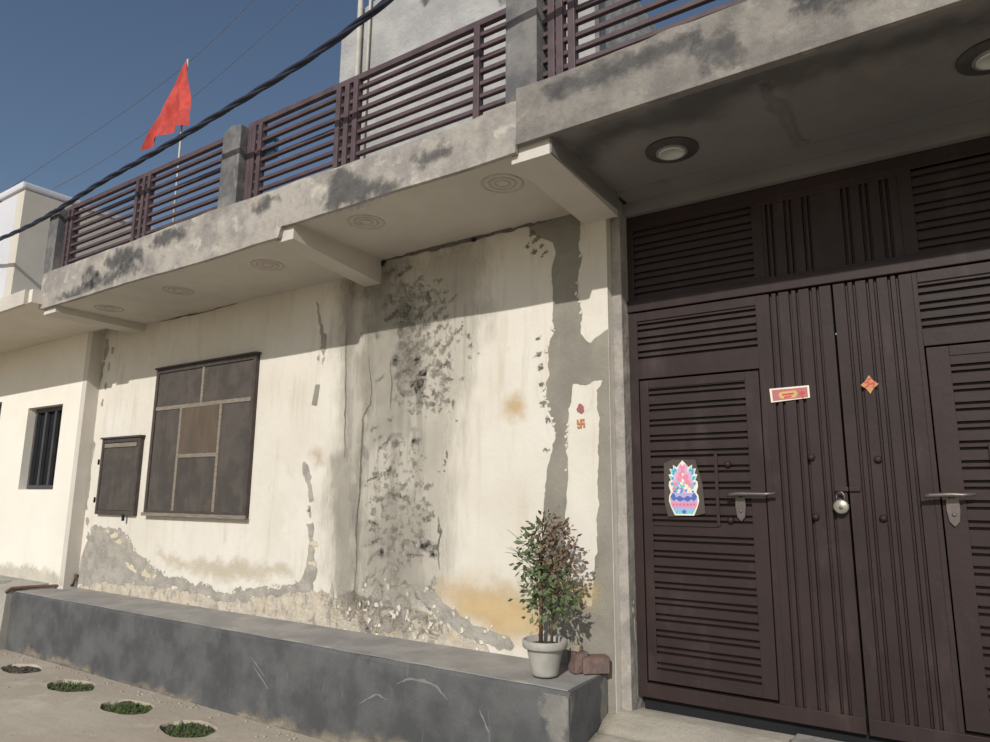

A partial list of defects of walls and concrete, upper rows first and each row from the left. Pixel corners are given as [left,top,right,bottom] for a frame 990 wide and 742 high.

water stain [546,30,739,98]
water stain [63,248,142,298]
peeling [100,339,114,406]
water stain [153,229,184,246]
peeling [316,302,327,363]
peeling [381,264,480,421]
flaking render [77,441,318,602]
water stain [79,253,489,652]
peeling [346,426,514,651]
peeling [525,214,616,714]